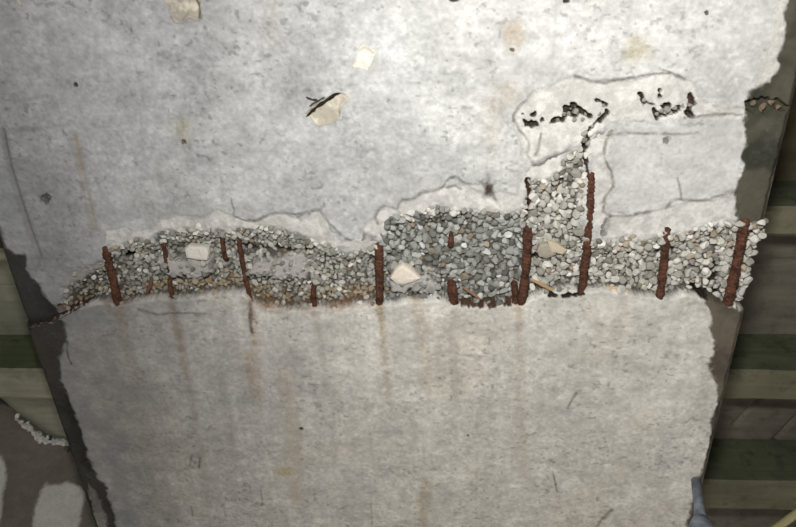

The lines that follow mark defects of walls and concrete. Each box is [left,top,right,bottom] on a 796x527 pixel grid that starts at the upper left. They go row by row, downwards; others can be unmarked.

spalling [165,0,202,23]
spalling [353,44,377,71]
spalling [60,73,769,310]